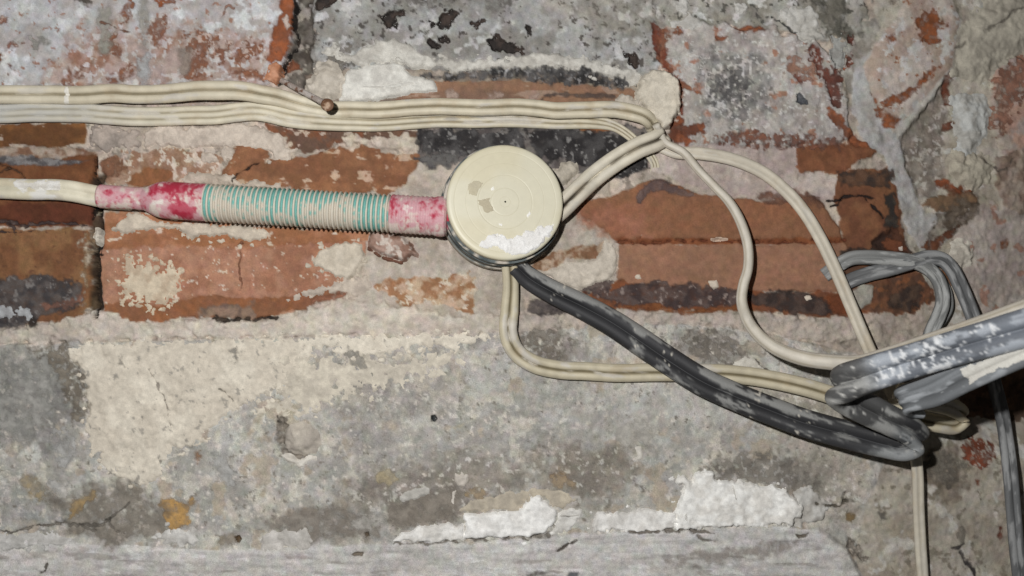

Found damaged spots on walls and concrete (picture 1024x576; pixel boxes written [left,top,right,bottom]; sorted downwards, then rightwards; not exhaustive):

flaking render [147,0,175,47]
flaking render [106,0,135,83]
spalling [181,0,300,86]
flaking render [100,156,127,177]
peeling [219,146,233,163]
spalling [357,230,419,265]
peeling [15,306,33,321]
flaking render [312,291,346,303]
crack [1,502,130,534]
damp [387,485,463,529]